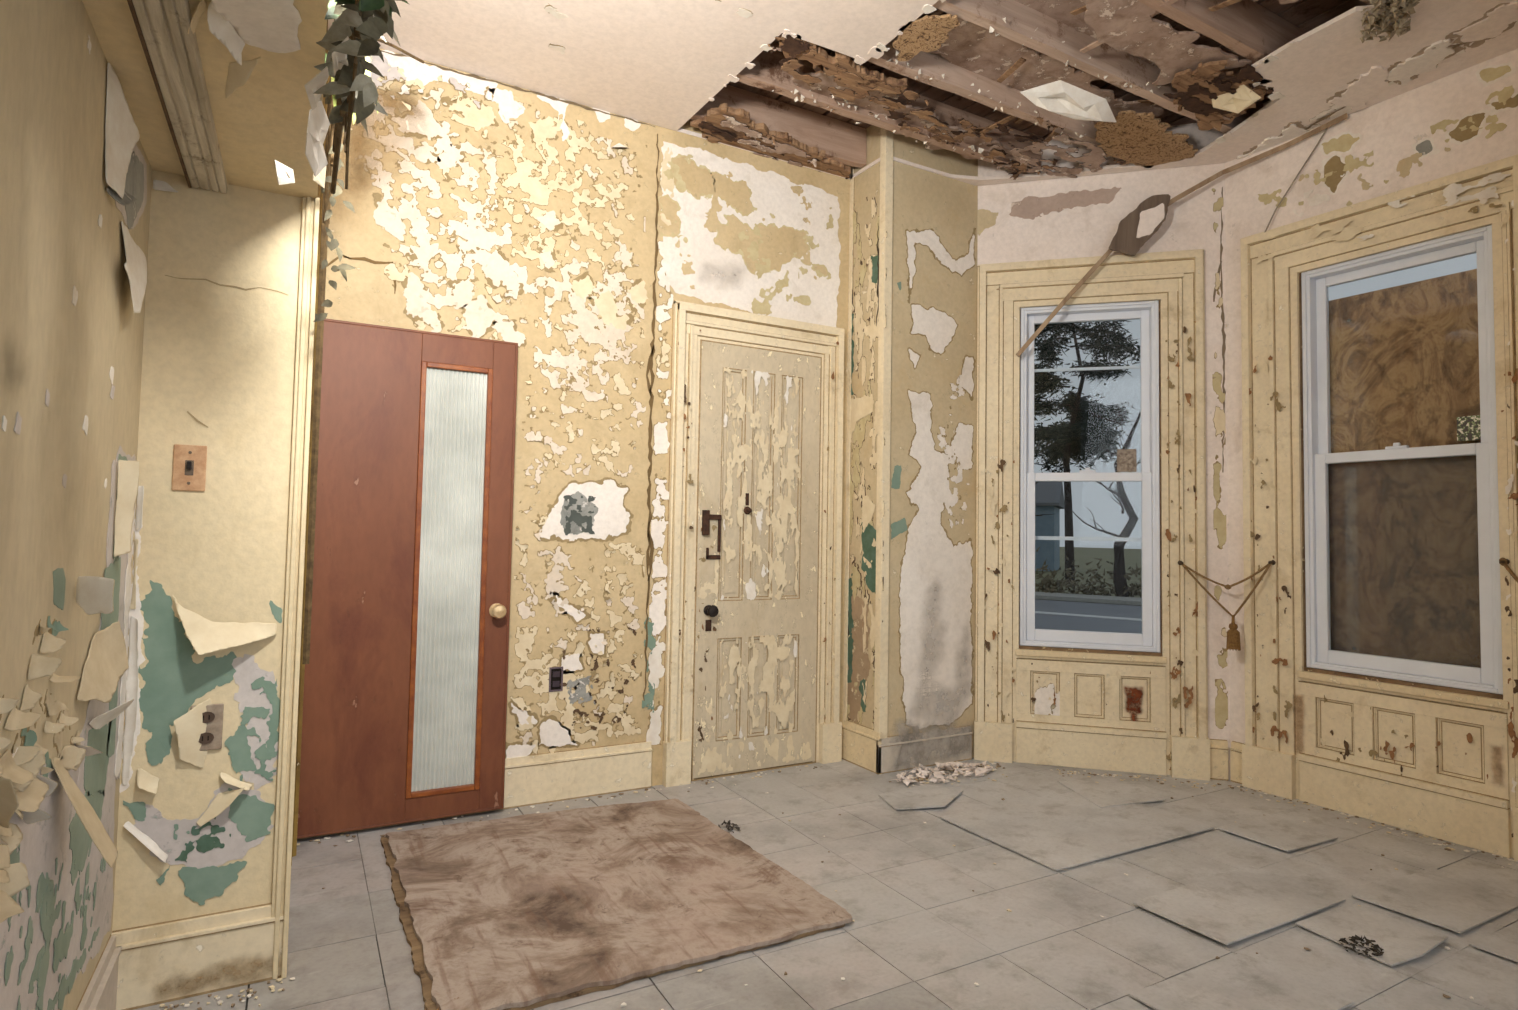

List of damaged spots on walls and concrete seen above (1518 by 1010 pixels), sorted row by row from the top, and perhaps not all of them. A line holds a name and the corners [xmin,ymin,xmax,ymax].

peeling [98,63,178,313]
peeling [922,0,946,14]
peeling [1163,41,1301,145]
peeling [1258,62,1518,244]
peeling [350,29,1126,775]
spalling [1505,436,1518,509]
peeling [0,446,283,1010]
spalling [1506,652,1518,758]